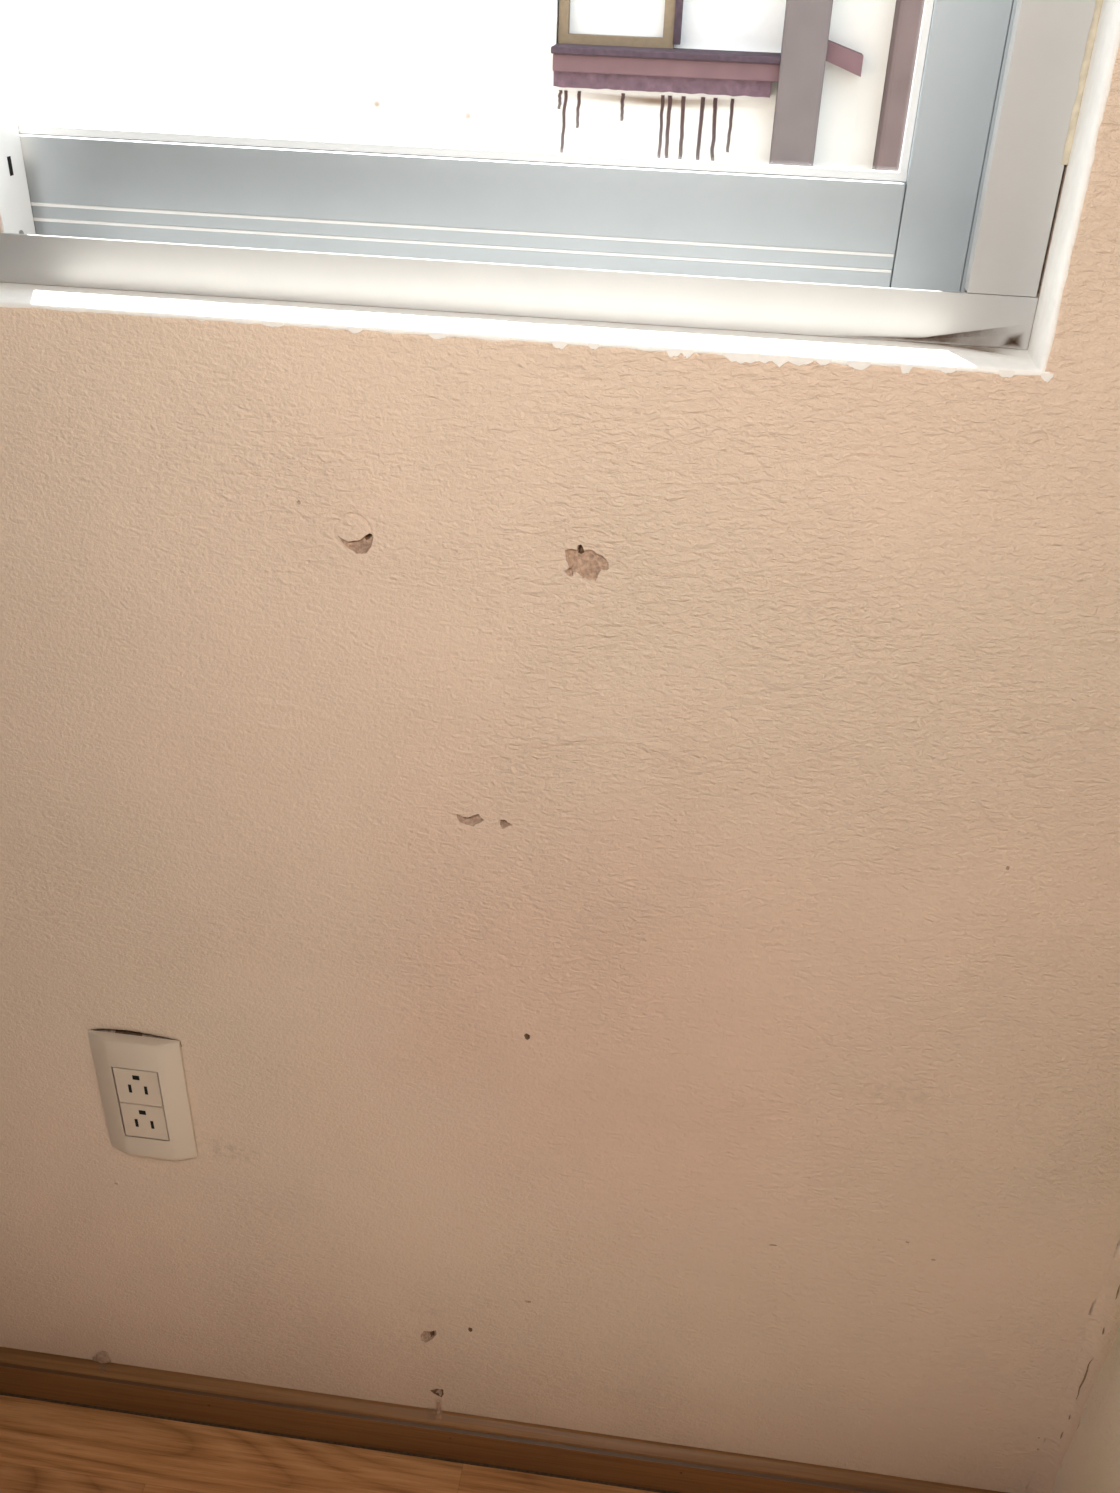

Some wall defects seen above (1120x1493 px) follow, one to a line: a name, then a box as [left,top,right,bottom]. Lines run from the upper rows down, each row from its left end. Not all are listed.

spalling [331,512,374,555]
flaking render [564,543,610,582]
spalling [456,813,514,829]